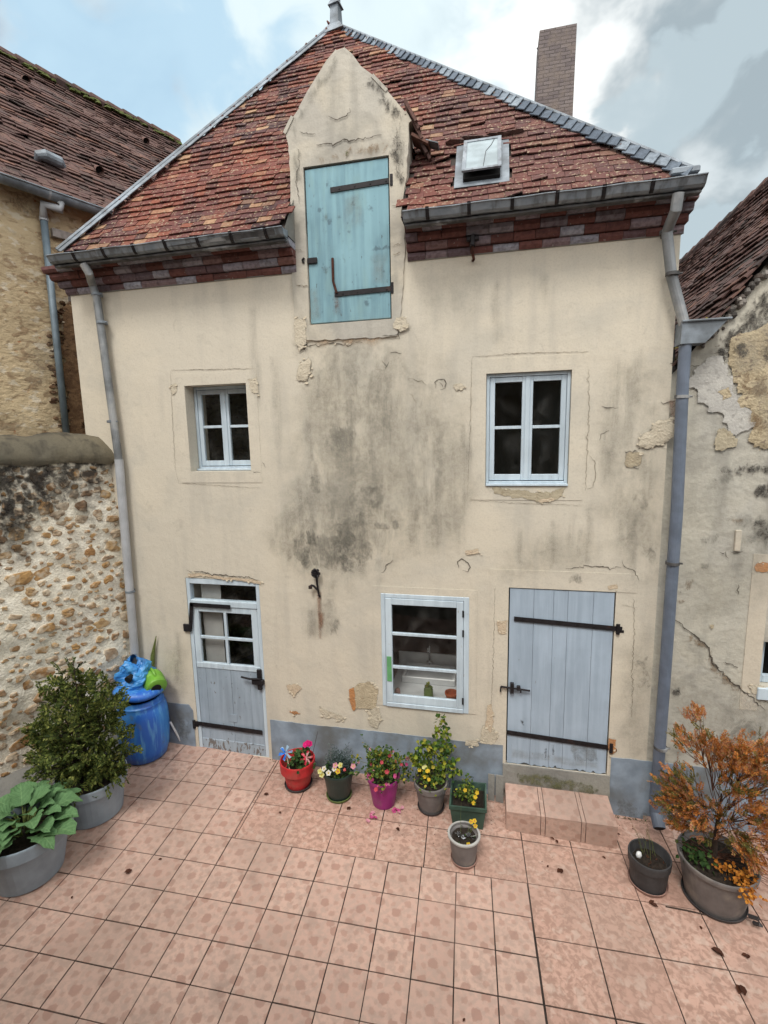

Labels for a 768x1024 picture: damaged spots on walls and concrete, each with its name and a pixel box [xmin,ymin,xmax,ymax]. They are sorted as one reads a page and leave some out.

flaking render [689,323,768,451]
flaking render [492,487,565,504]
flaking render [188,571,264,585]
crack [675,620,765,710]
flaking render [319,682,382,728]
flaking render [465,704,499,748]